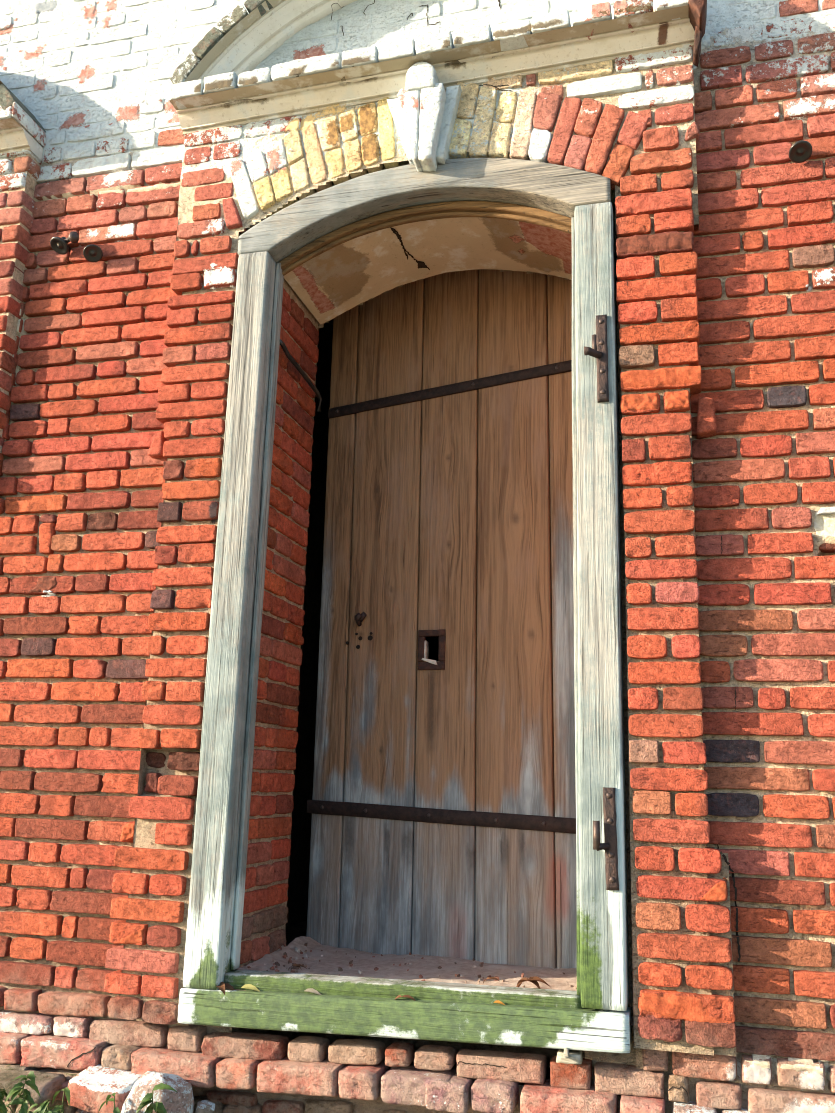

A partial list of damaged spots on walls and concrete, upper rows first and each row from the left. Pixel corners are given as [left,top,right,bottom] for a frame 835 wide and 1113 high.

peeling [35,0,57,14]
peeling [81,0,116,29]
peeling [18,44,46,60]
peeling [78,64,95,83]
peeling [59,112,90,130]
peeling [109,104,140,125]
peeling [159,100,180,125]
crack [390,227,430,270]